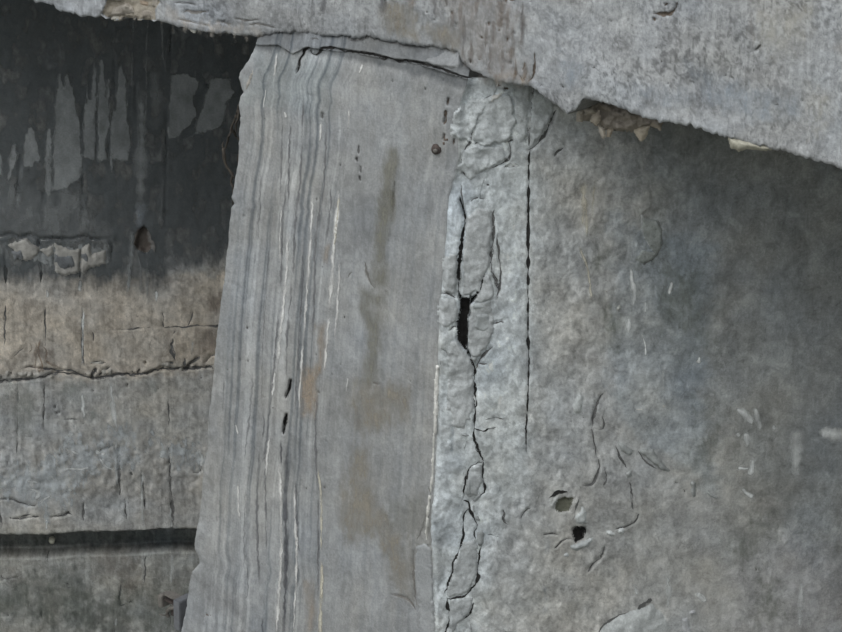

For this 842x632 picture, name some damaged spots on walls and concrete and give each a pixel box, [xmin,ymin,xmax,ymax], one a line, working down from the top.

spalling [102,0,160,21]
crack [296,36,471,78]
spalling [576,102,663,141]
damp [0,0,258,300]
peeling [8,238,106,276]
crack [348,263,375,288]
crack [440,52,563,632]
crack [392,516,426,610]